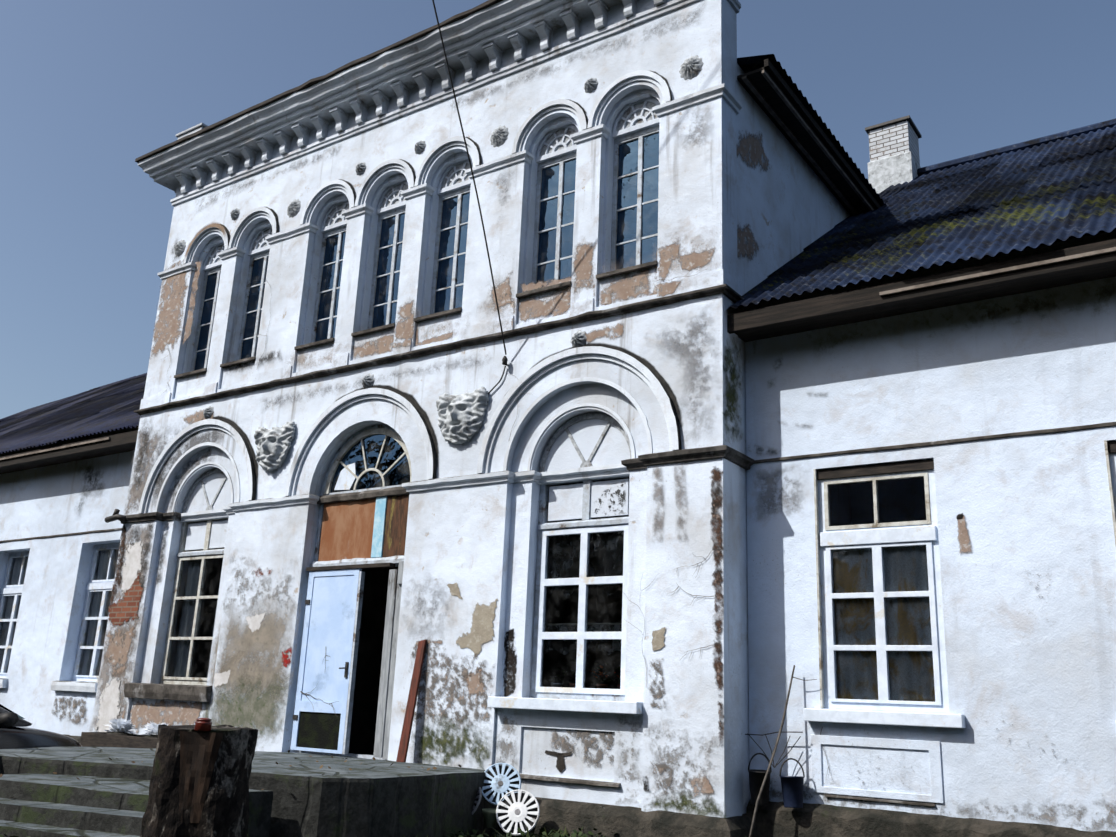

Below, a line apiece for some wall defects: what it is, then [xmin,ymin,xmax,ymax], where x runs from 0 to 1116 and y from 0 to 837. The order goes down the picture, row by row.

flaking render [151,260,202,356]
flaking render [353,301,453,358]
flaking render [488,241,714,325]
water stain [532,326,704,427]
flaking render [956,513,971,553]
flaking render [52,525,202,733]
water stain [204,570,292,738]
flaking render [447,583,463,599]
flaking render [412,599,517,728]
water stain [499,716,514,766]
water stain [551,721,640,781]
water stain [653,730,711,796]